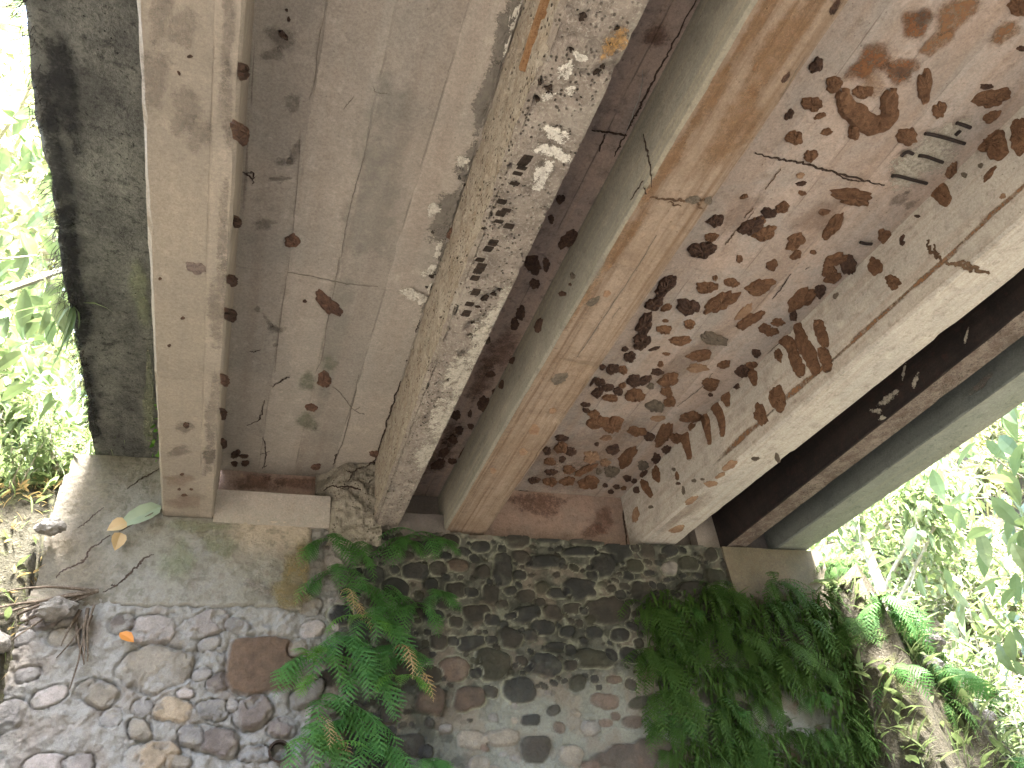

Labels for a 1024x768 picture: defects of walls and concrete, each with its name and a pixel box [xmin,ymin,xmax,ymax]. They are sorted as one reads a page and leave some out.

leakage [36,32,99,450]
crack [247,129,408,491]
peeling [396,0,522,379]
crack [591,0,712,209]
spalling [528,229,902,523]
crack [725,152,885,245]
peeling [870,363,919,420]
spalling [784,56,1024,207]
corrosion [845,0,980,85]
crack [926,239,990,275]
corrosion [991,22,1020,45]
crack [103,554,154,592]